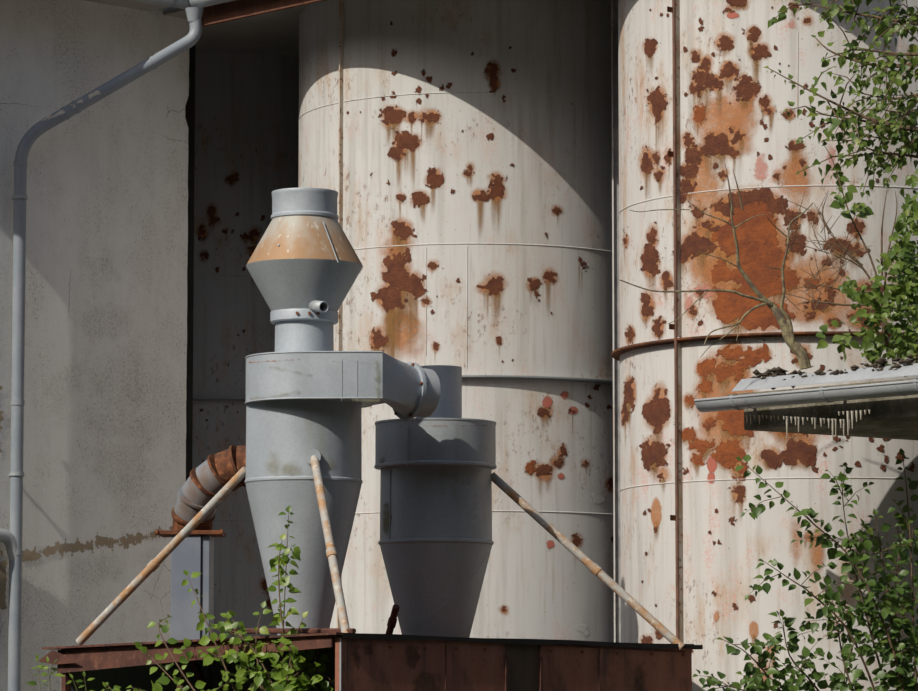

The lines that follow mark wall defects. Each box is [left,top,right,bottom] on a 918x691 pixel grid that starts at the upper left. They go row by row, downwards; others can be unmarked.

rust [723,0,747,14]
rust [396,167,455,211]
rust [472,173,507,213]
rust [640,26,884,408]
rust [370,220,439,351]
rust [477,274,504,305]
rust [527,271,557,301]
rust [624,325,635,343]
rust [525,440,568,482]
rust [606,376,754,503]
rust [760,432,850,473]
peeling [0,550,8,610]